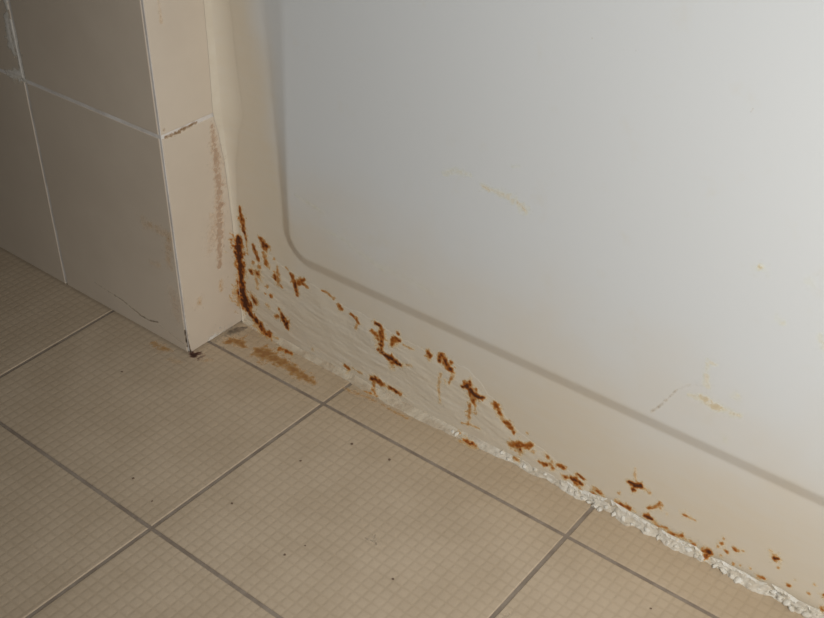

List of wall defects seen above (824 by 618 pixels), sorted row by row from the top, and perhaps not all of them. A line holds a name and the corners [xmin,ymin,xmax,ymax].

rust [223,205,316,385]
rust [321,290,360,329]
rust [369,321,412,368]
rust [343,364,402,402]
peeling [560,479,824,618]